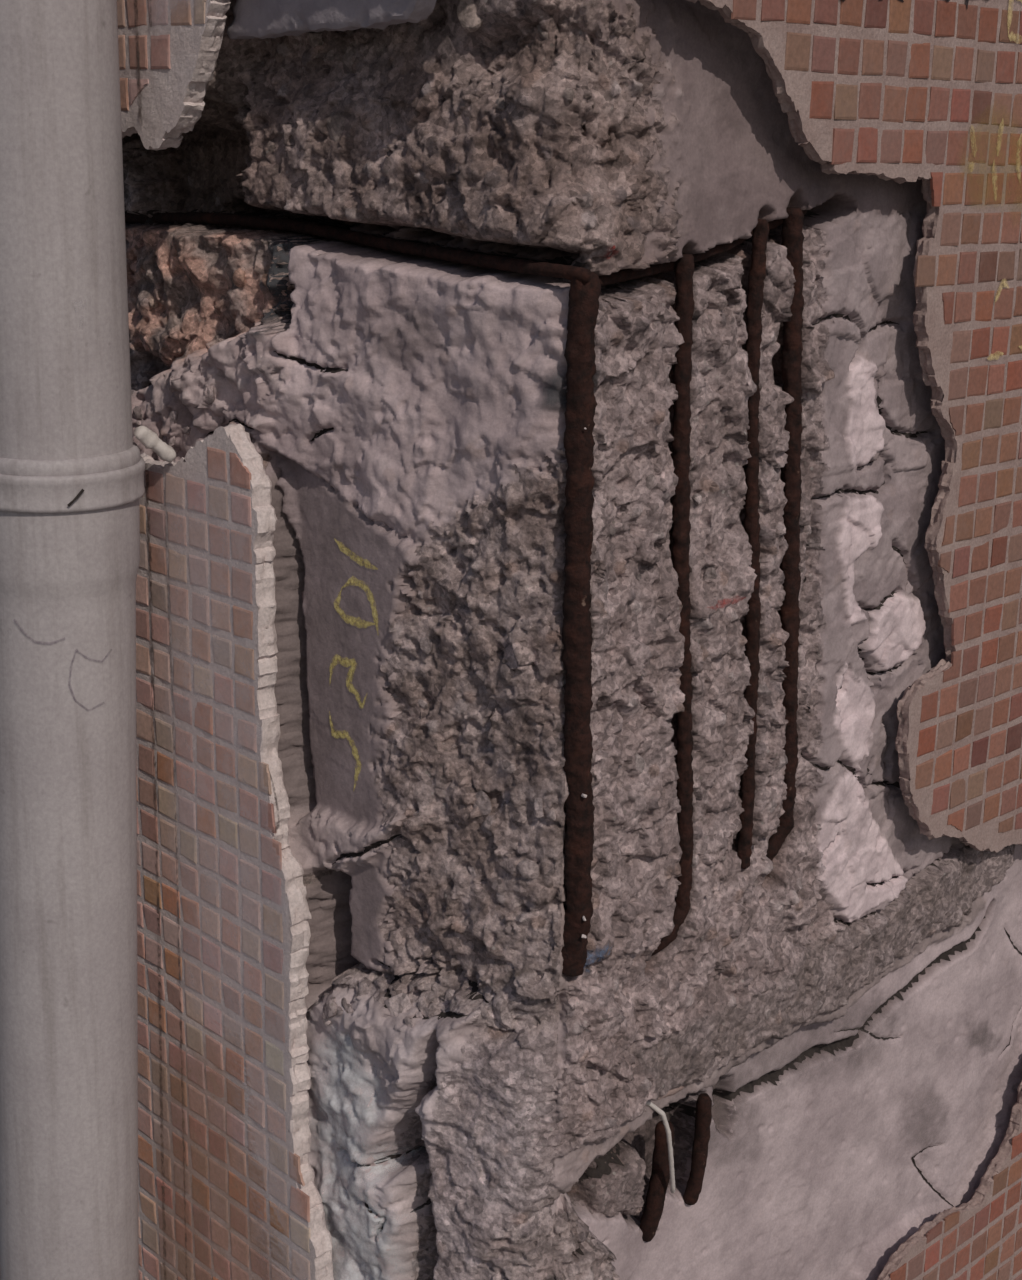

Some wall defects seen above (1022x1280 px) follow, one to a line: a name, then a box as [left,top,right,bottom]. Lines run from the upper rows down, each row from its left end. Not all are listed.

spalling [122,0,683,395]
crack [812,313,898,332]
crack [274,351,348,373]
crack [876,387,928,438]
crack [811,461,885,499]
crack [840,546,908,689]
spalling [303,207,1022,1280]
crack [801,753,900,788]
crack [665,916,1022,1117]
crack [579,1141,624,1181]